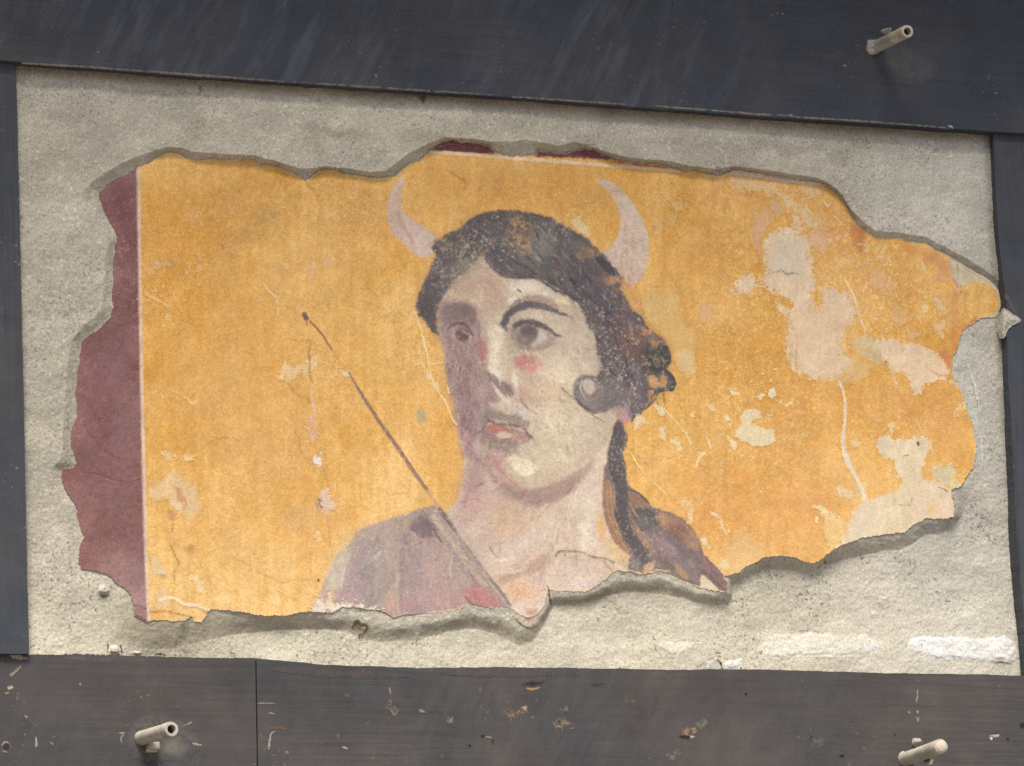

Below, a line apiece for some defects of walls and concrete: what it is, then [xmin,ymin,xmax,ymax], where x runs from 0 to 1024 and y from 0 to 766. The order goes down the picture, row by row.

peeling [632,173,958,469]
crack [837,380,869,501]
peeling [812,421,962,551]